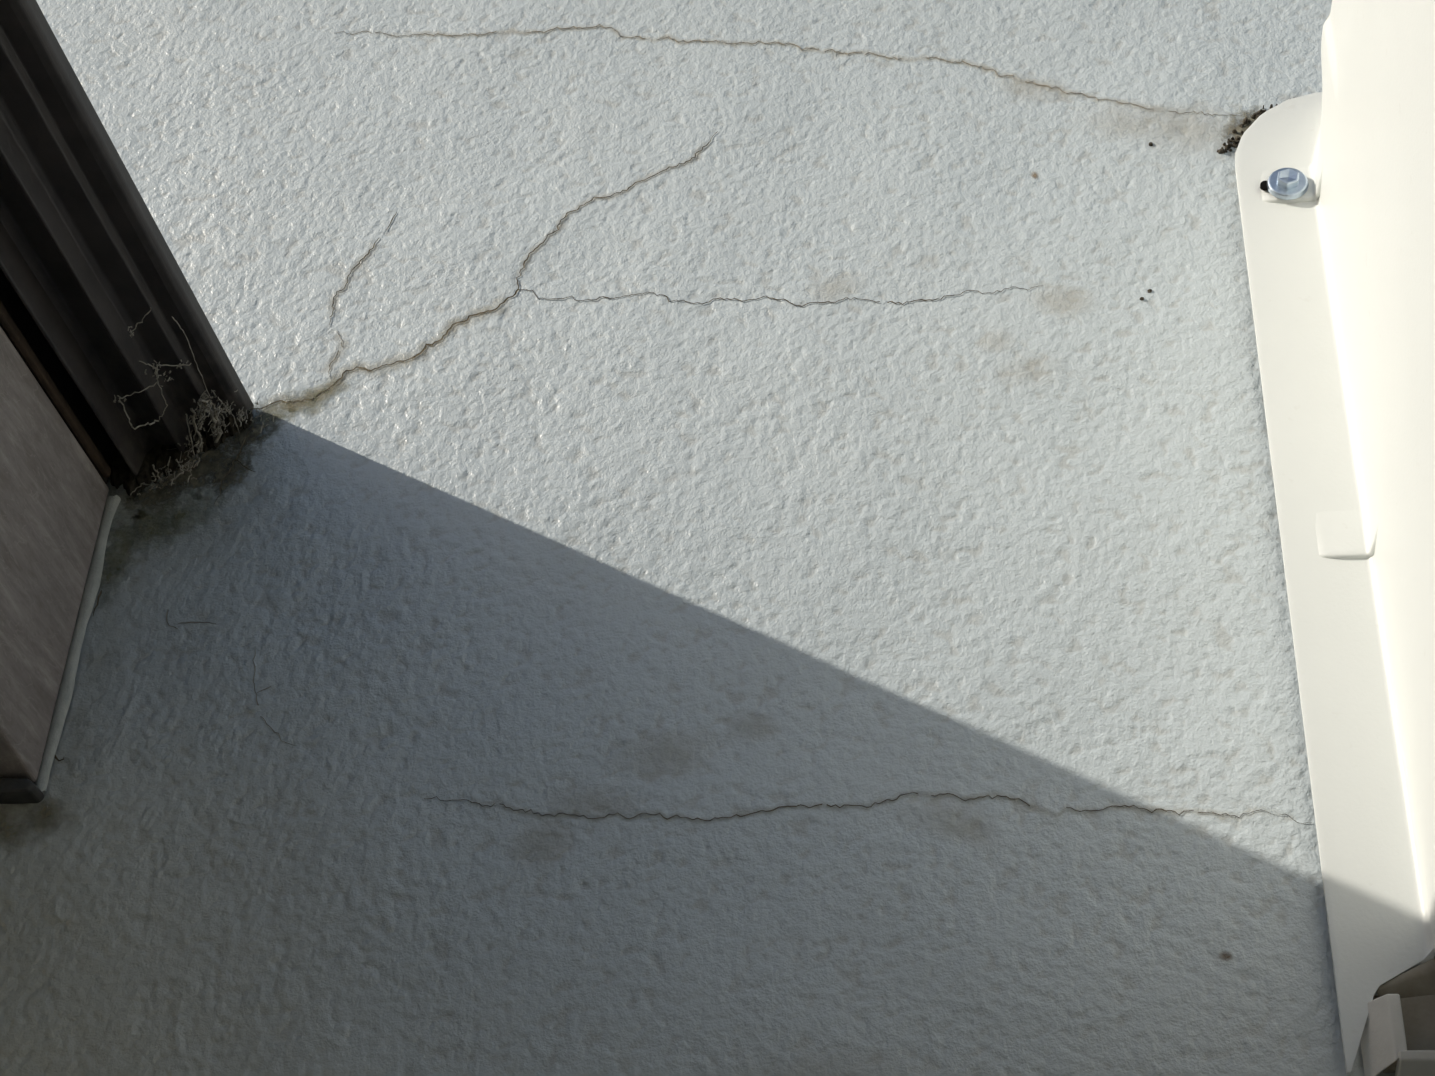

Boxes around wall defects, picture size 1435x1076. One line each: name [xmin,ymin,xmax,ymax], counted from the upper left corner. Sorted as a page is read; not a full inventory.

crack [337,24,1237,116]
crack [259,131,1038,410]
water stain [126,414,279,522]
crack [424,792,1030,821]
crack [1066,805,1309,824]